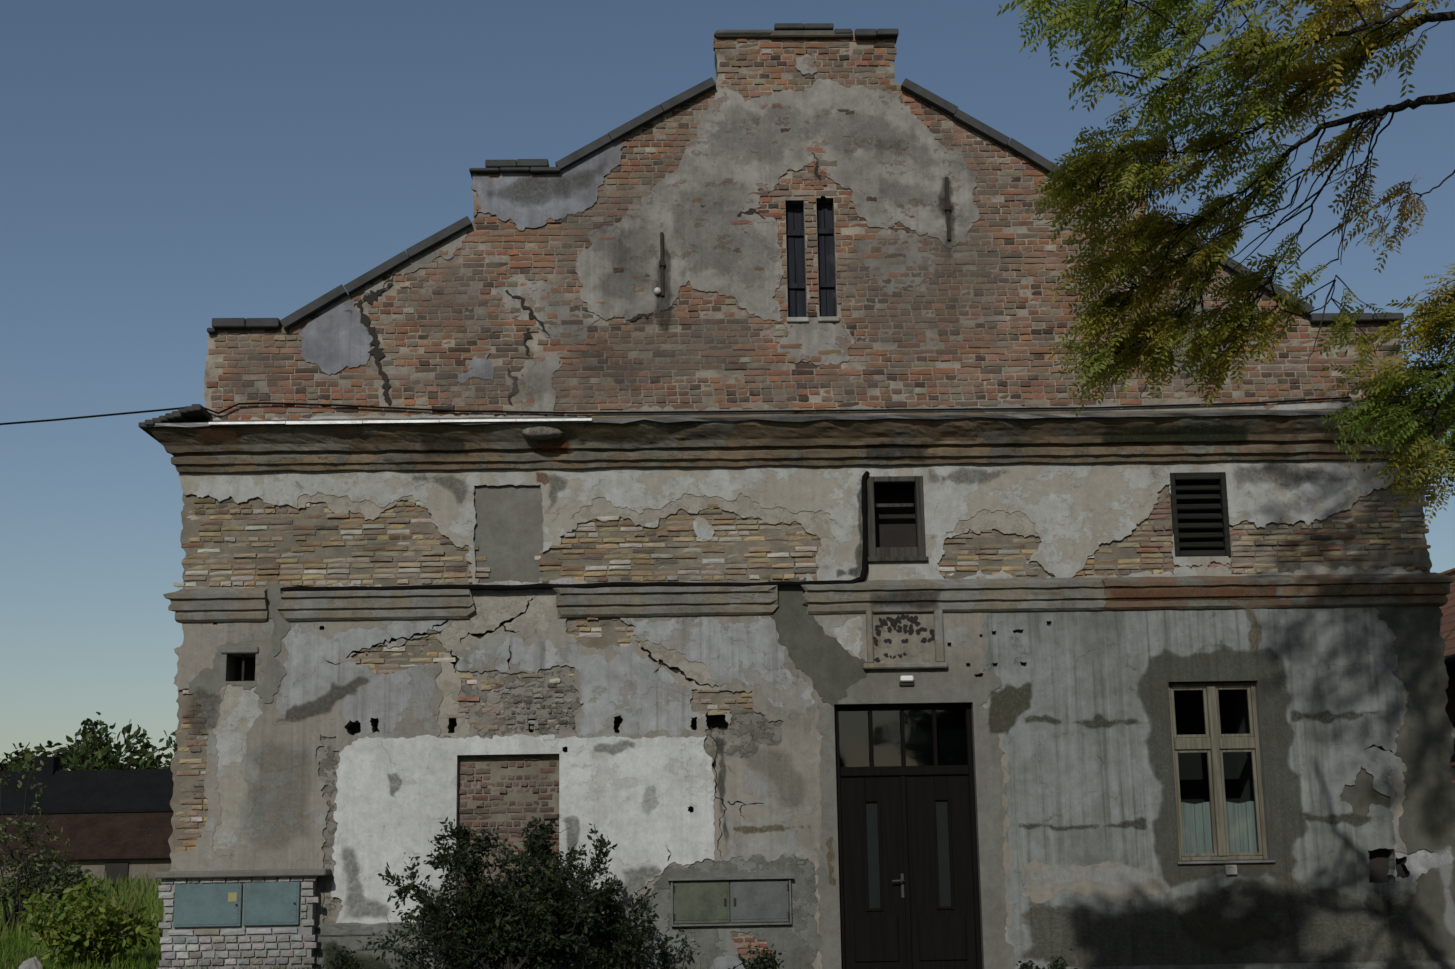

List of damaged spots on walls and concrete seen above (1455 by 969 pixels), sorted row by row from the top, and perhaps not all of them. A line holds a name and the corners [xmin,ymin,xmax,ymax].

flaking render [207,37,1403,420]
crack [356,283,393,404]
crack [505,290,550,404]
peeling [174,494,491,589]
peeling [535,503,822,593]
peeling [937,477,1436,579]
crack [326,598,533,673]
crack [635,640,719,688]
peeling [168,688,209,853]
spalling [339,629,584,900]
spalling [1340,766,1391,817]